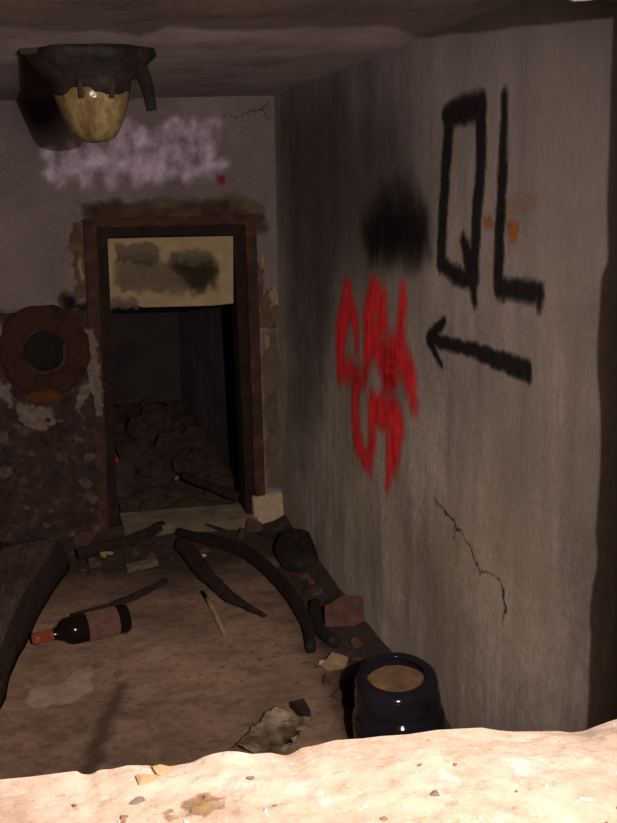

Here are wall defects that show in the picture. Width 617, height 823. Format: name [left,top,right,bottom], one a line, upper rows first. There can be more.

crack [436,501,507,619]